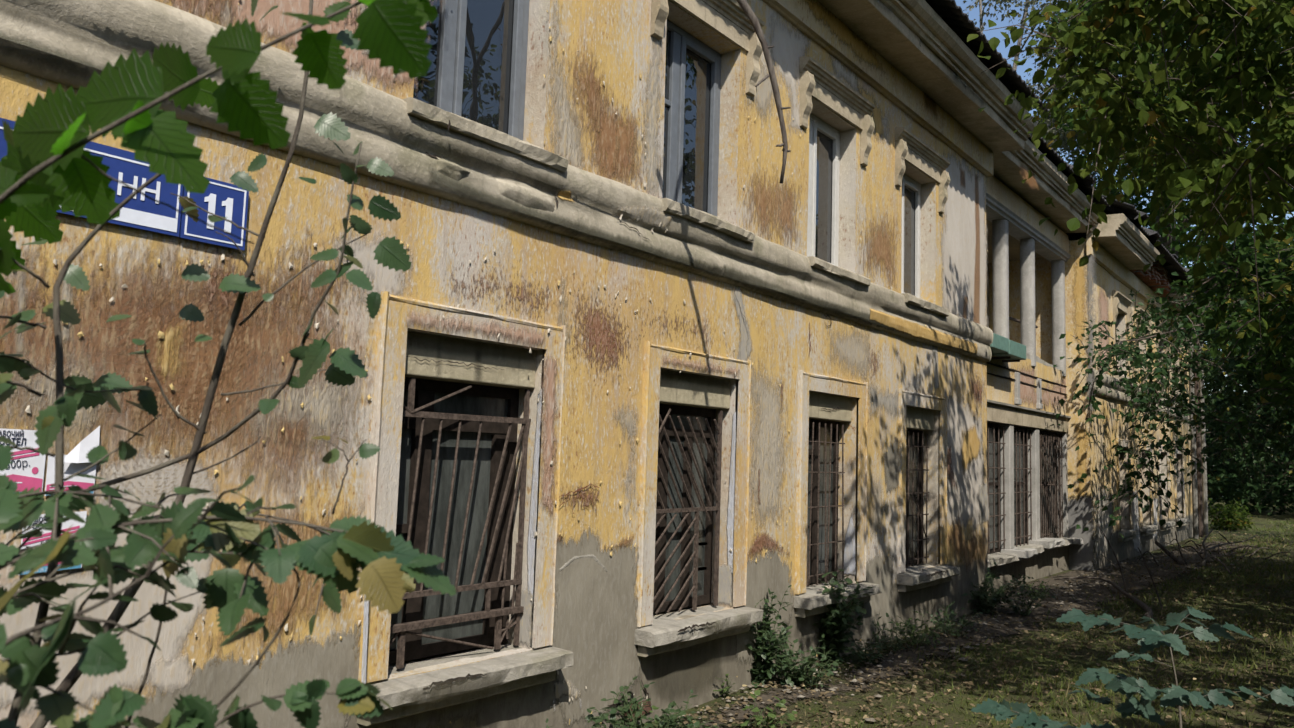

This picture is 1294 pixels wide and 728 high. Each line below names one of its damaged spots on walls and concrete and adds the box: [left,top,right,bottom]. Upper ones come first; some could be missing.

peeling [0,230,412,728]
peeling [407,247,794,727]
damp [431,170,901,332]
peeling [926,377,987,577]